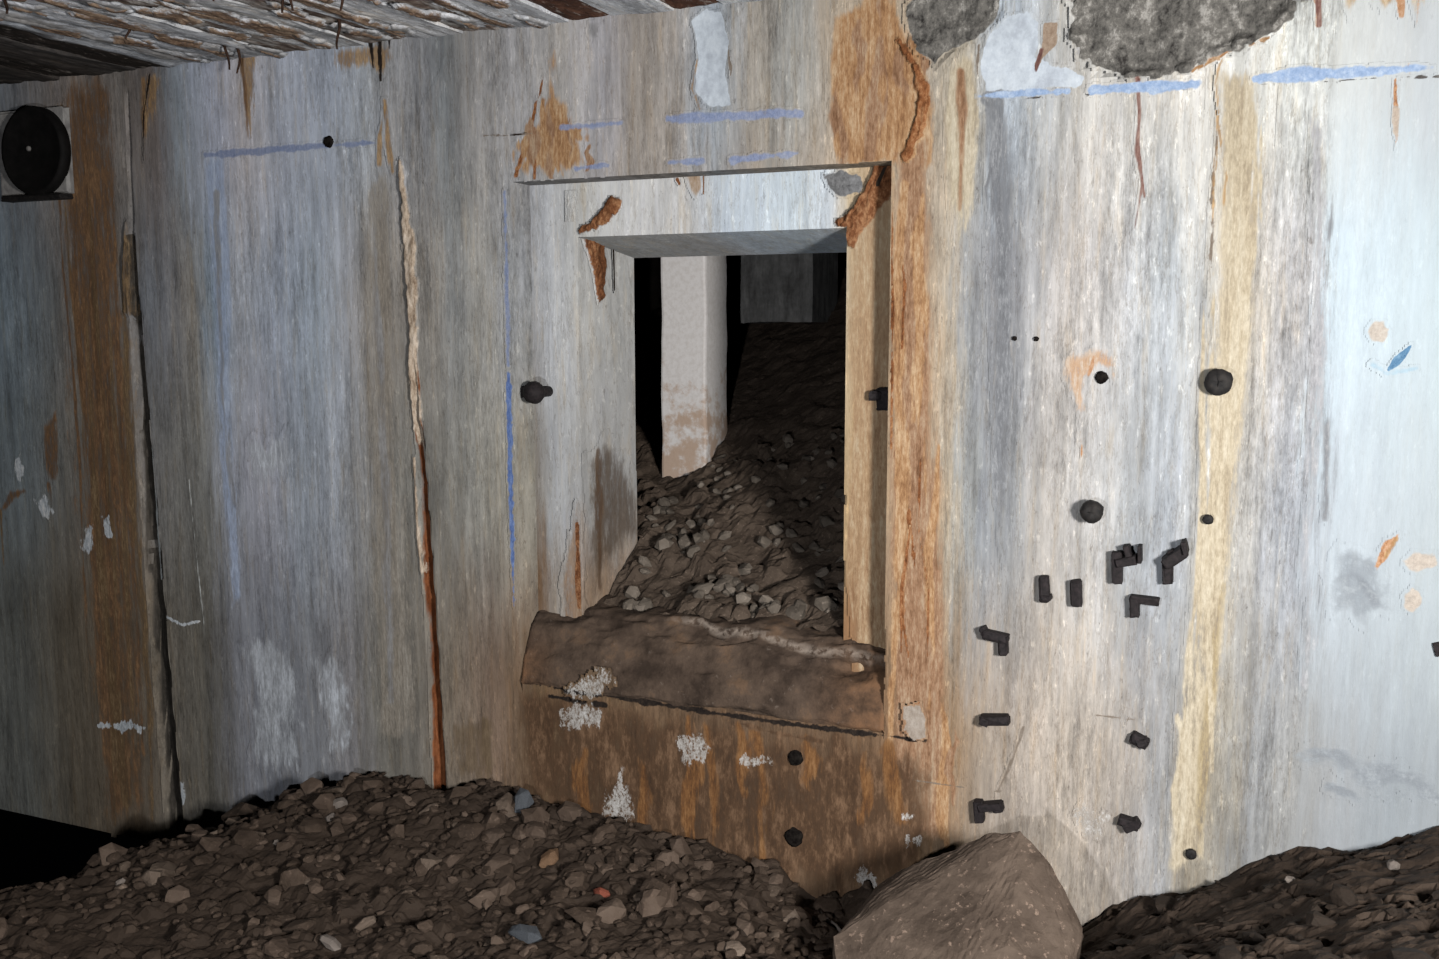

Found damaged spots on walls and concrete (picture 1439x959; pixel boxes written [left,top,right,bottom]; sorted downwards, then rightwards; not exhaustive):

rust [0,0,605,838]
water stain [443,666,942,898]
rust [824,0,966,853]
spalling [902,0,1305,93]